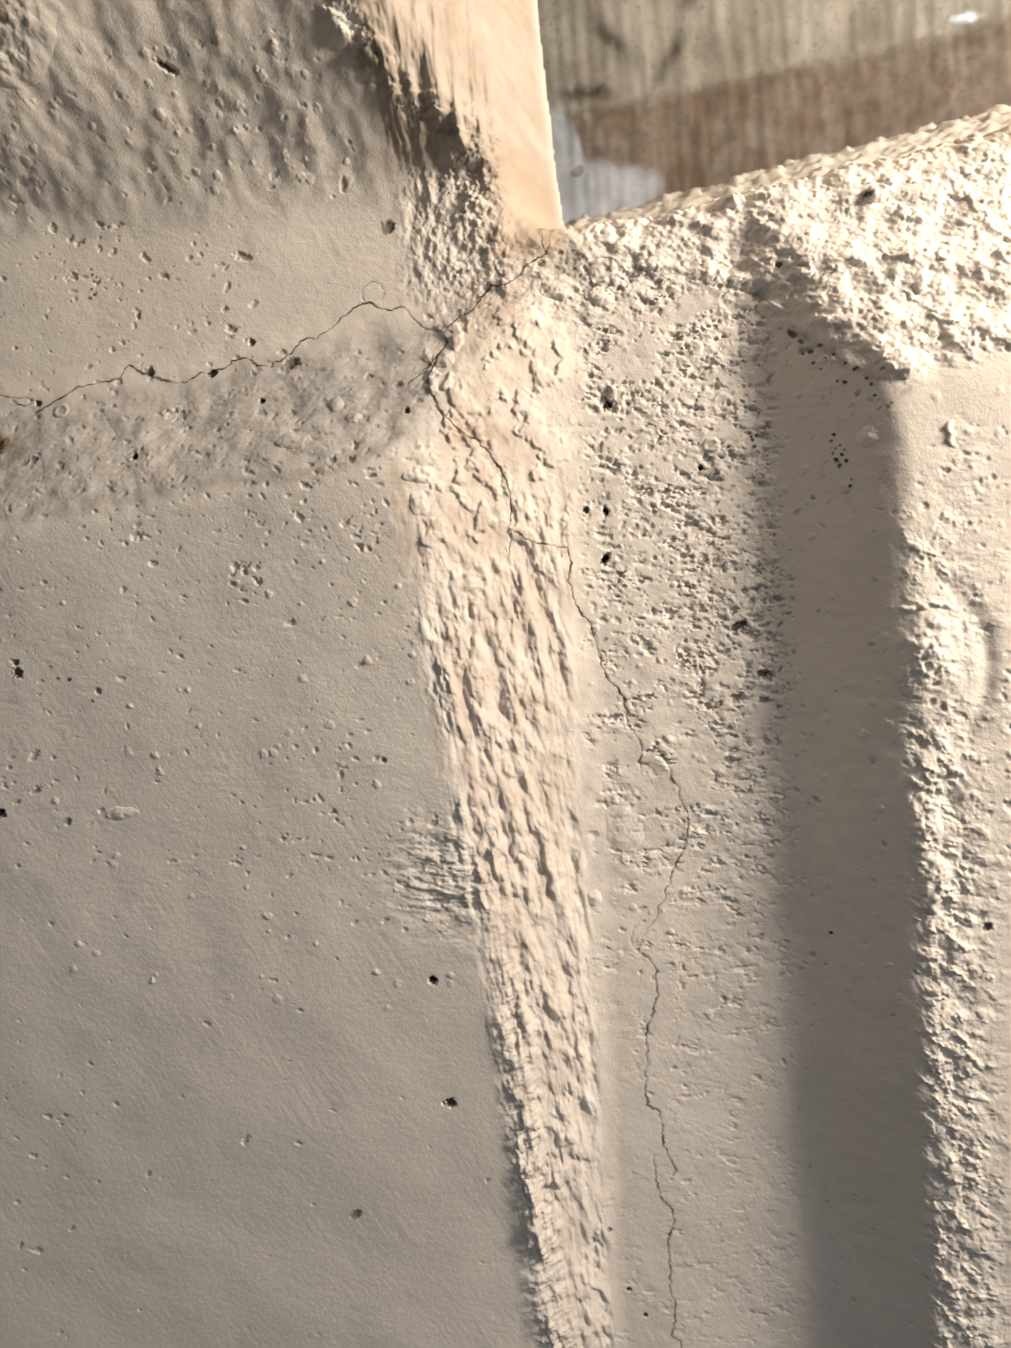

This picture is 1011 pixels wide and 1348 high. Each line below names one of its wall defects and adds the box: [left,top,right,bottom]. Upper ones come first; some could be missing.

crack [0,237,689,894]
crack [643,954,659,1037]
crack [644,1074,682,1348]